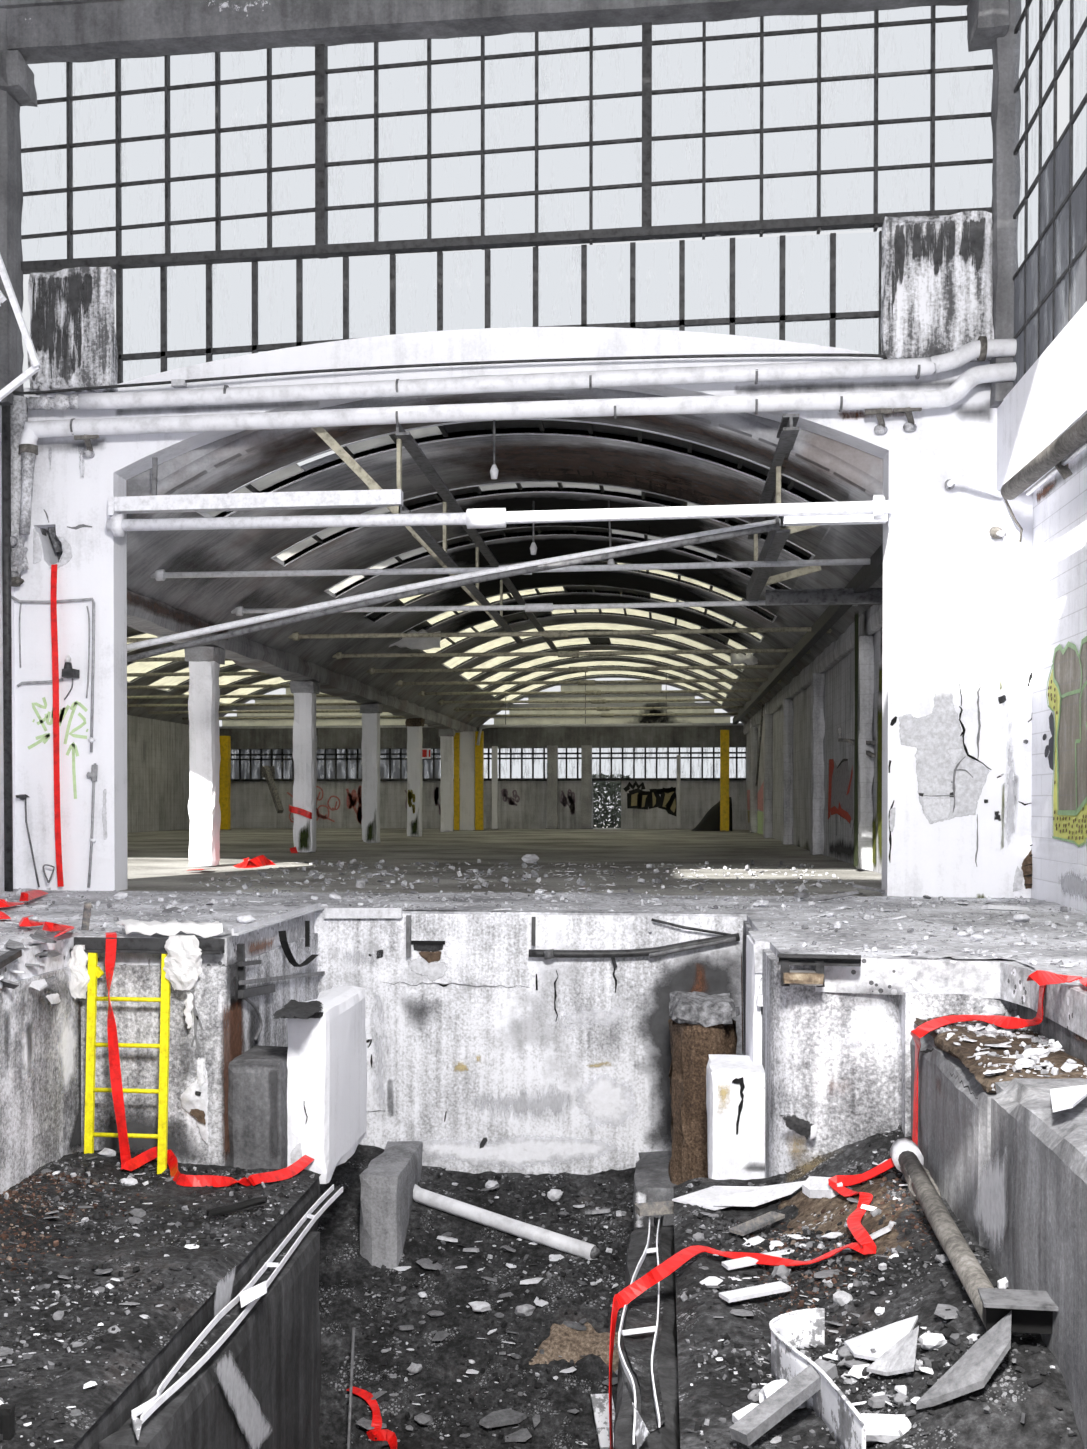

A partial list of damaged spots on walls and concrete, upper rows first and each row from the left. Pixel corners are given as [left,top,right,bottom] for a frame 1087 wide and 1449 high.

water stain [31,272,95,381]
water stain [888,218,986,318]
spalling [899,677,1001,824]
crack [888,677,1032,866]
water stain [640,931,746,1147]